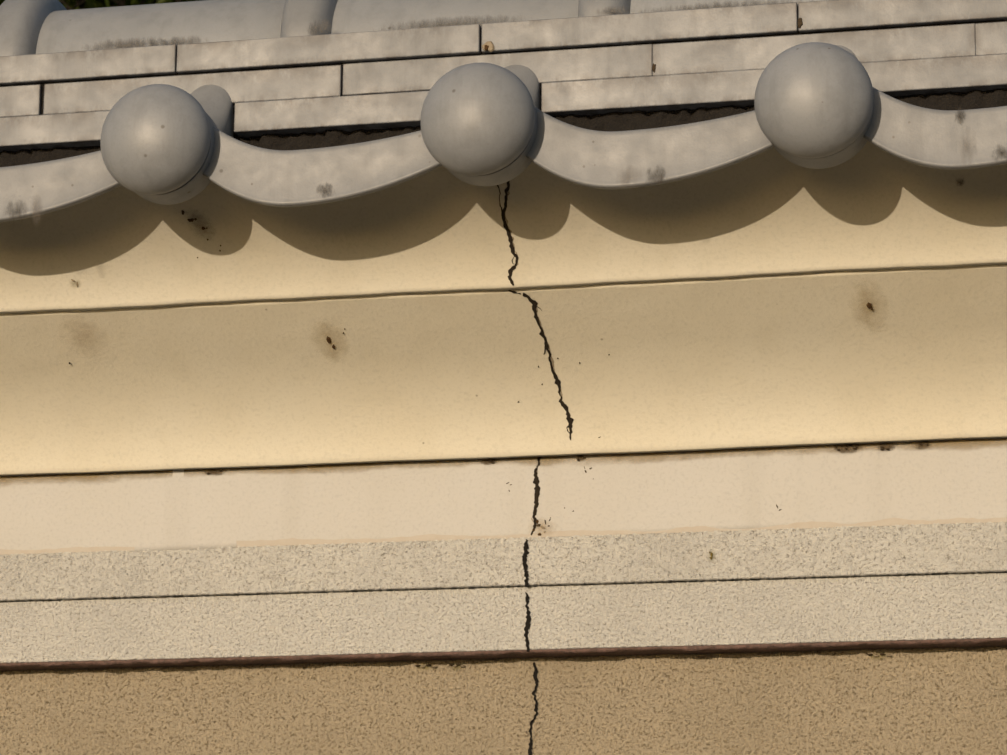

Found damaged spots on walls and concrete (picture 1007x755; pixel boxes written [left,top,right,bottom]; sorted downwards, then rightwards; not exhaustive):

crack [497,181,574,440]
crack [522,457,540,755]